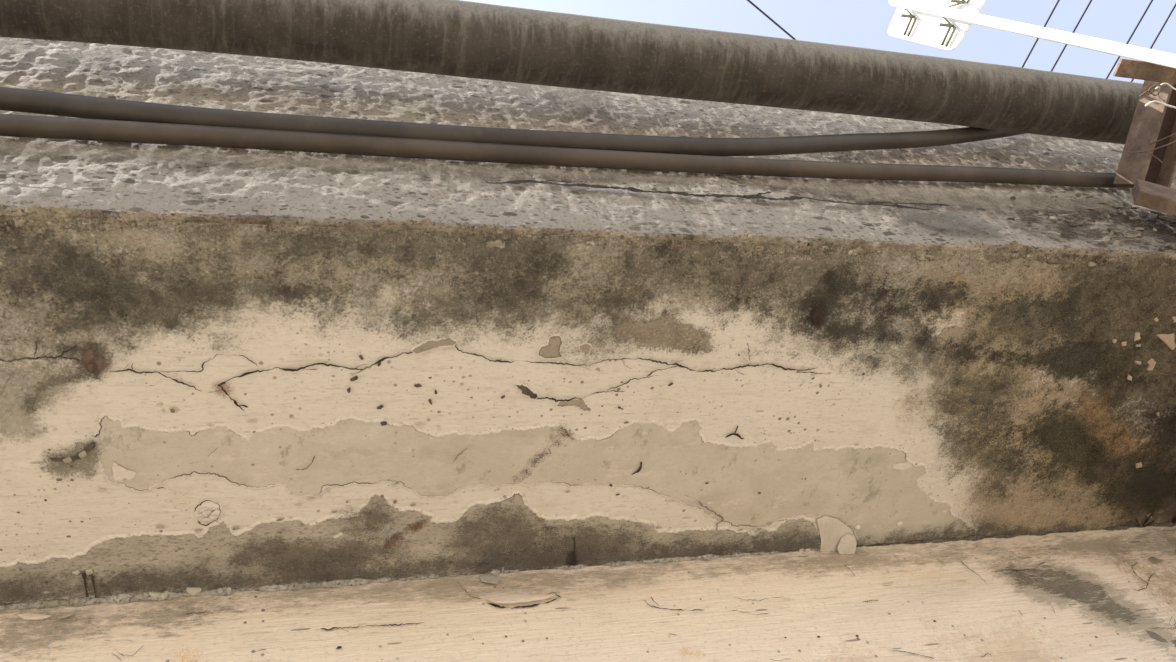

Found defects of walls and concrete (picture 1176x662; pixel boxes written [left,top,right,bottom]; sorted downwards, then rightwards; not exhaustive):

leakage [0,138,708,184]
spalling [0,192,1176,267]
leakage [753,179,1121,239]
peeling [612,313,713,355]
spalling [1154,316,1176,350]
crack [112,352,413,412]
peeling [513,382,539,400]
peeling [555,396,603,412]
leakage [0,215,1176,547]
crack [455,338,908,402]
spalling [1127,358,1156,381]
peeling [0,405,982,620]